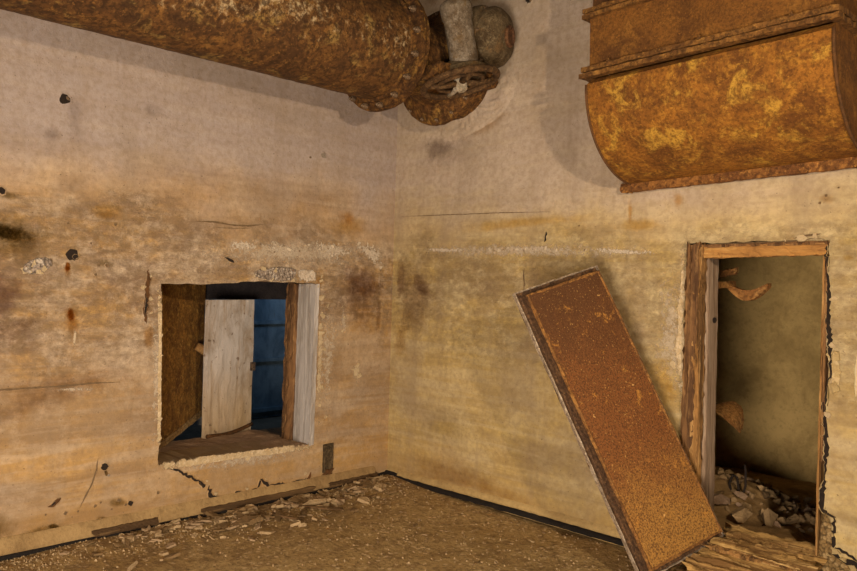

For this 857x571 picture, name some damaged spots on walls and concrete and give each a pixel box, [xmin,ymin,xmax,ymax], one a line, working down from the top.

water stain [0,225,21,240]
spalling [20,257,53,274]
spalling [254,266,323,287]
crack [140,270,154,324]
crack [0,382,115,391]
crack [163,466,311,498]